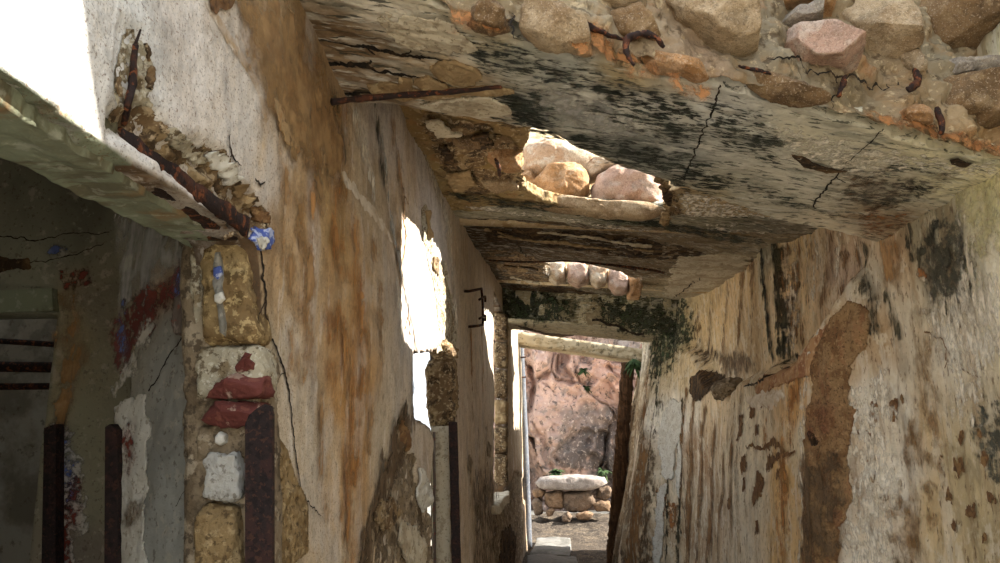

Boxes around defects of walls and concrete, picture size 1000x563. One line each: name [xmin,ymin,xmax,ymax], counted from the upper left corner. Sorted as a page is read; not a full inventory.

corrosion [120,29,142,127]
spalling [108,28,275,251]
corrosion [330,85,502,123]
corrosion [571,22,710,100]
crack [684,85,721,181]
crack [766,55,899,109]
corrosion [905,68,922,93]
water stain [423,30,1000,563]
peeling [109,259,181,563]
crack [258,251,321,516]
spalling [365,420,434,563]
spalling [755,300,904,563]